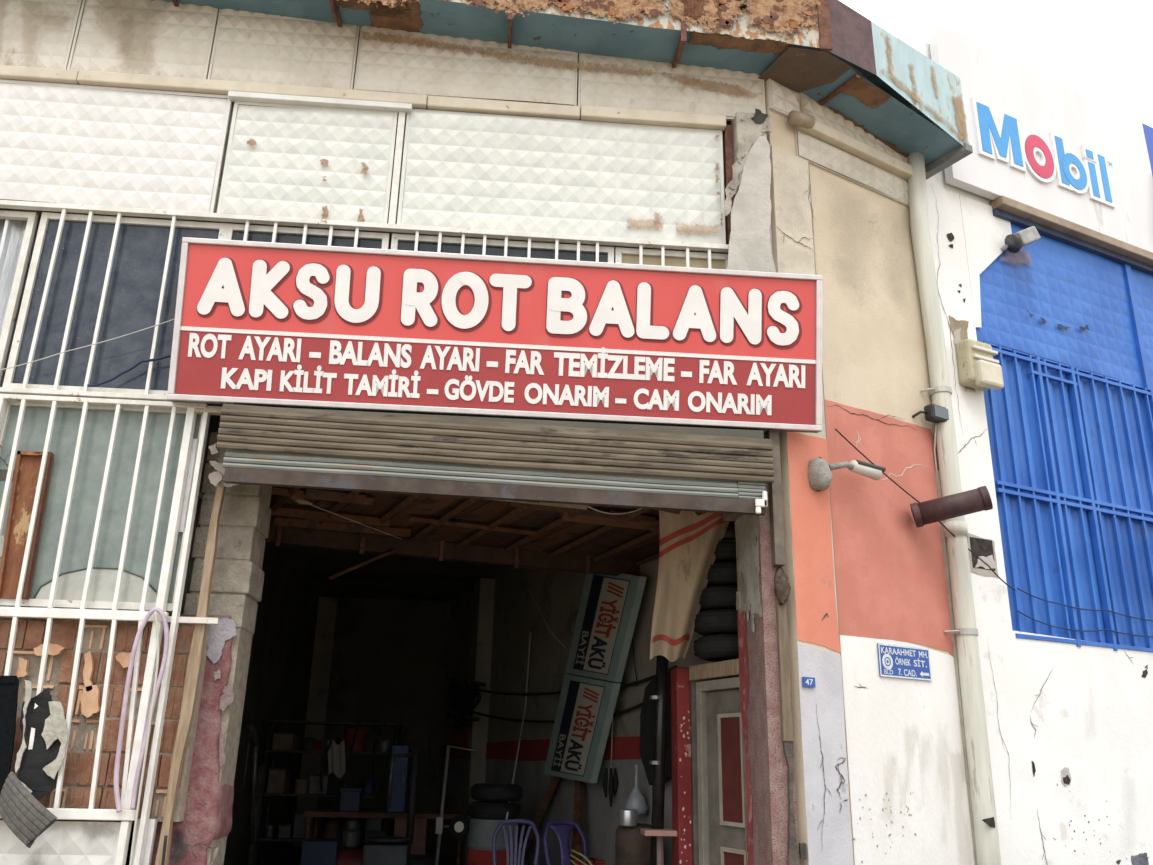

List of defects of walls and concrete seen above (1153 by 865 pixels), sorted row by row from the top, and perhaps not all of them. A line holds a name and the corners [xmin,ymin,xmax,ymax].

rust [337,0,756,96]
rust [466,0,822,55]
spalling [724,108,772,216]
peeling [206,618,237,712]
crack [816,705,832,852]
peeling [1116,853,1149,865]